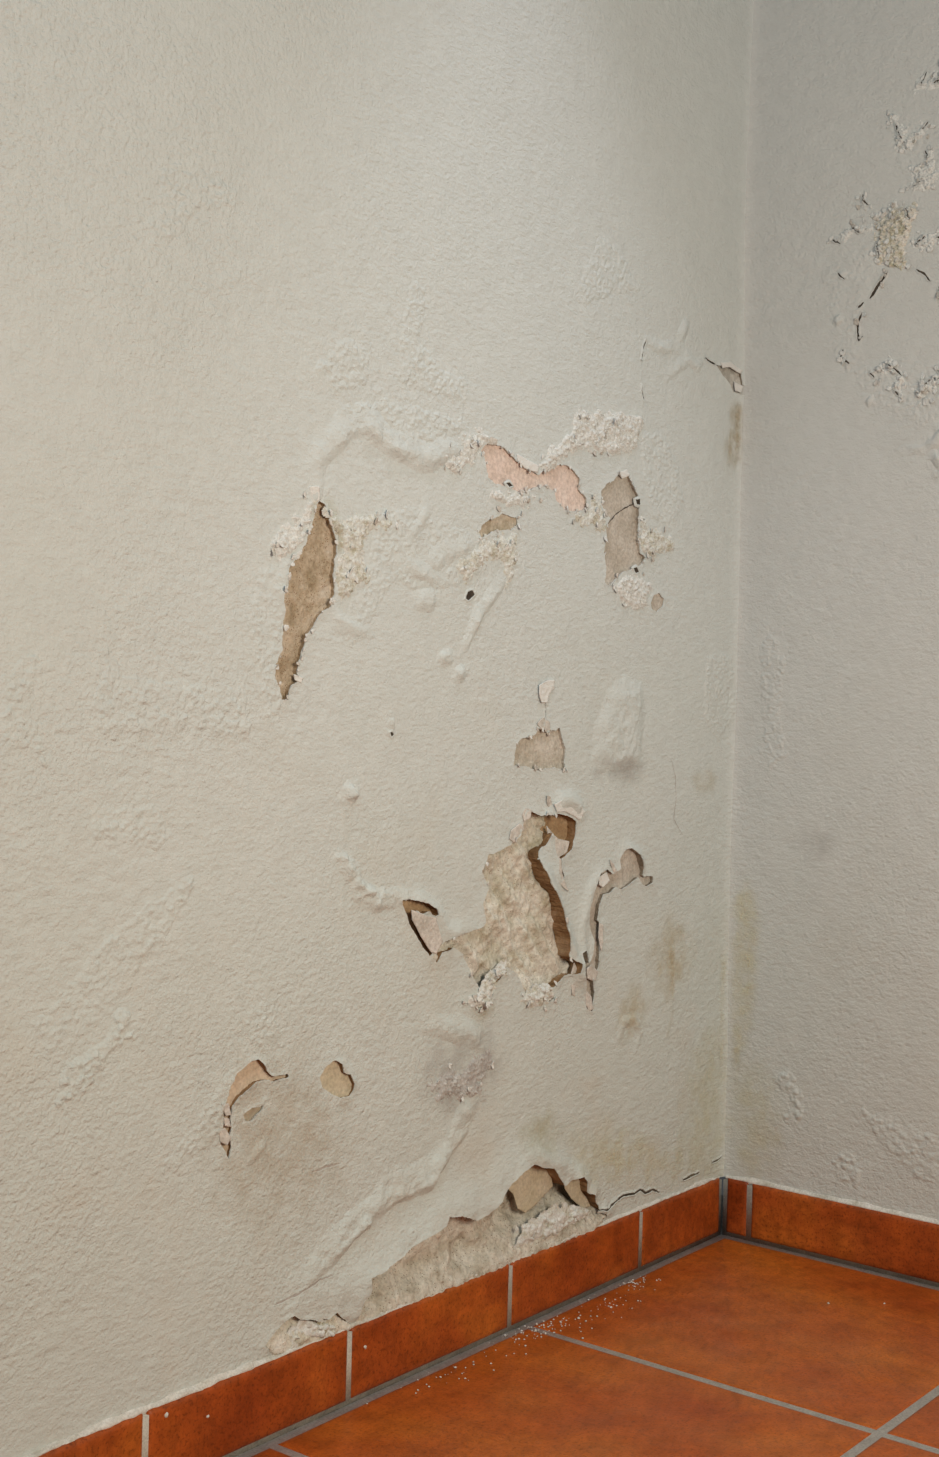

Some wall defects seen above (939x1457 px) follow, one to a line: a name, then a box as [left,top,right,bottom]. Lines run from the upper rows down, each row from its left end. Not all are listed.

peeling [826,110,939,274]
spalling [270,486,399,700]
peeling [444,406,675,612]
spalling [514,680,568,773]
spalling [402,795,653,1013]
spalling [219,1060,288,1157]
spalling [320,1061,354,1098]
spalling [266,1165,607,1355]